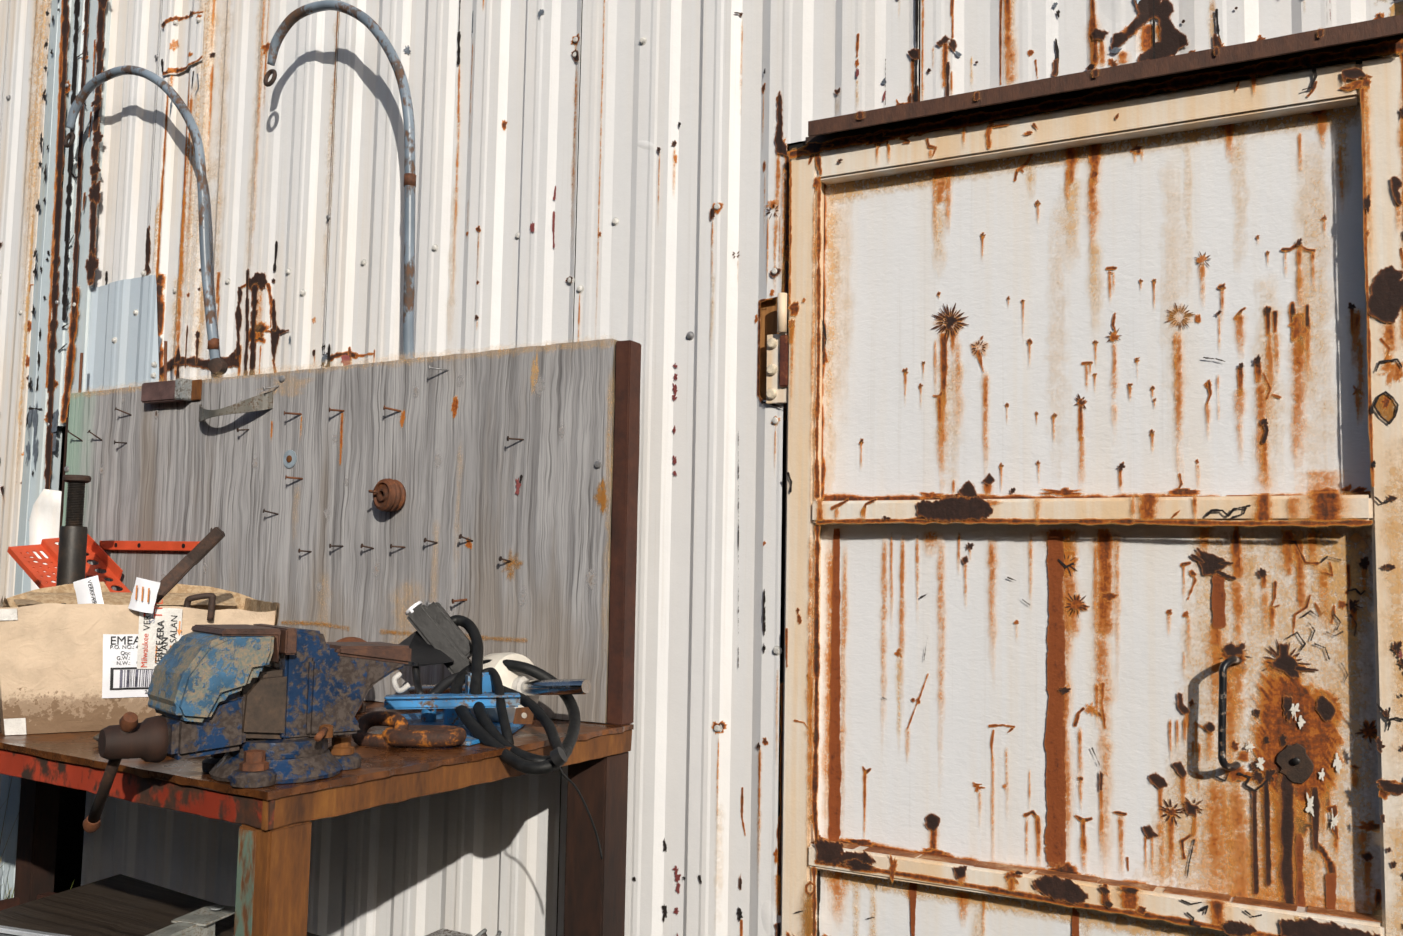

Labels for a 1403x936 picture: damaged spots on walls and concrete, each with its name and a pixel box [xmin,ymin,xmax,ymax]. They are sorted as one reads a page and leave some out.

rust [18,0,109,489]
rust [155,52,291,376]
rust [258,0,270,107]